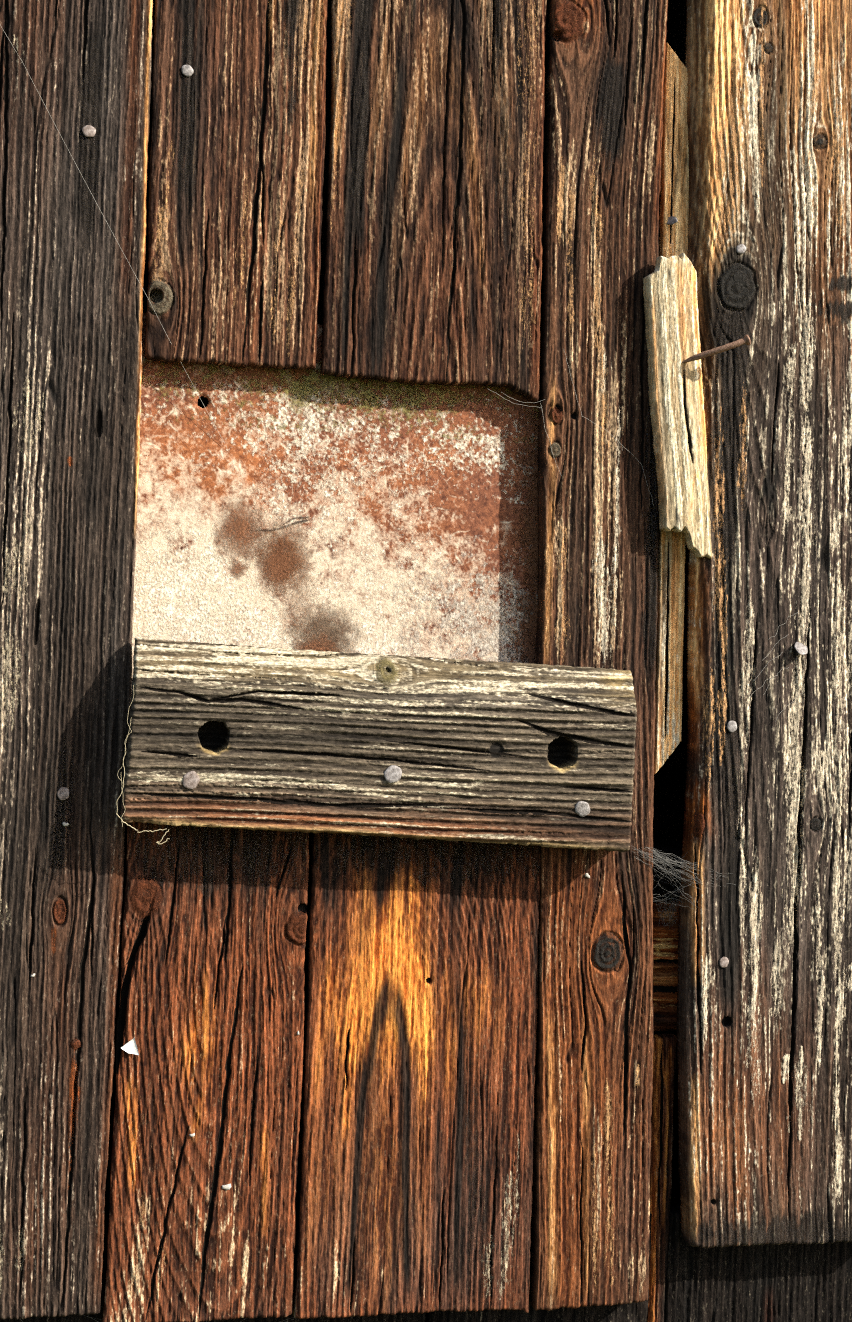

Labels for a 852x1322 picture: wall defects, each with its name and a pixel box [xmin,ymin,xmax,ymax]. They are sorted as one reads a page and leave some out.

crack [442,0,495,378]
crack [142,750,198,758]
crack [141,687,340,710]
corrosion [219,501,308,593]
corrosion [291,607,358,653]
crack [240,542,669,771]
corrosion [508,410,539,664]
crack [62,802,96,1312]
crack [116,786,632,1322]